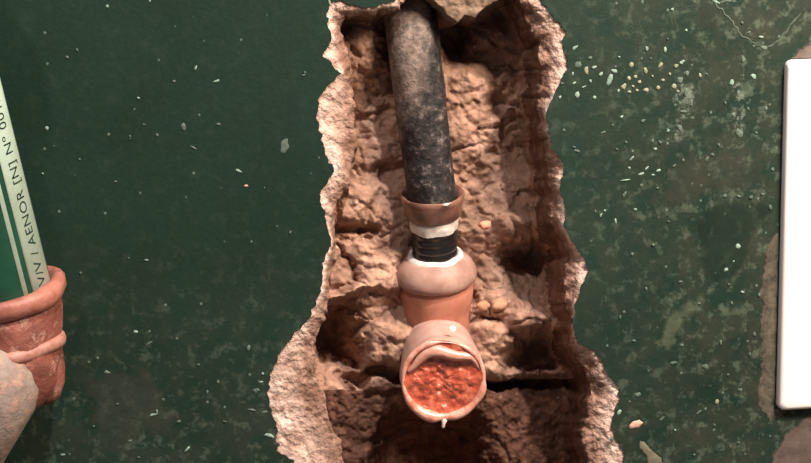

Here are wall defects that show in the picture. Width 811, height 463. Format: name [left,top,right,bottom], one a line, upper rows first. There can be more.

flaking render [248,0,693,463]
crack [712,0,801,48]